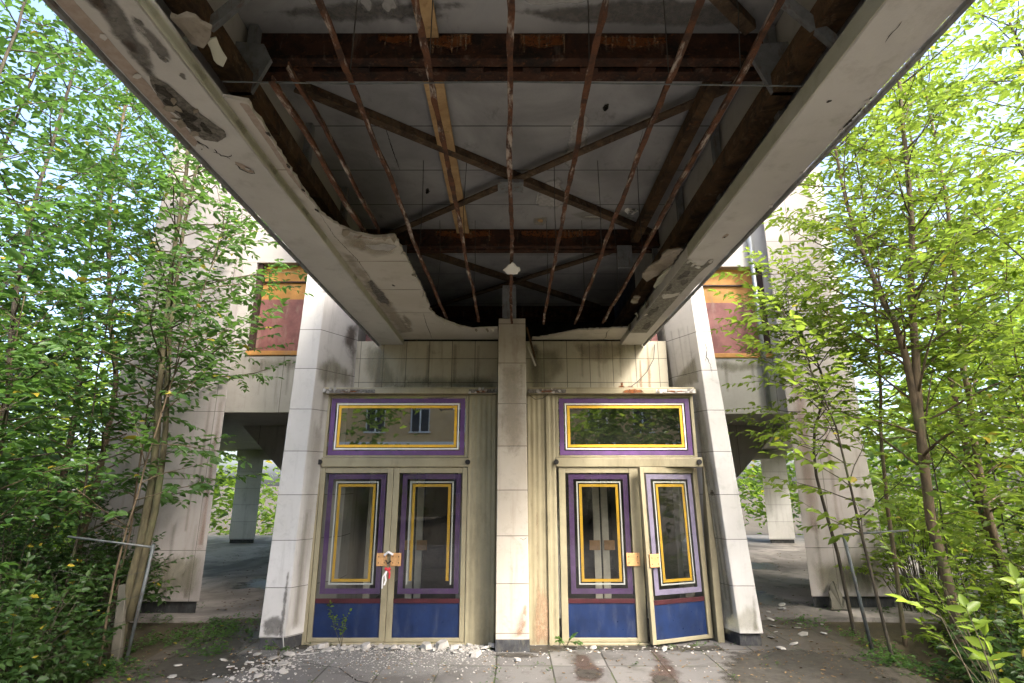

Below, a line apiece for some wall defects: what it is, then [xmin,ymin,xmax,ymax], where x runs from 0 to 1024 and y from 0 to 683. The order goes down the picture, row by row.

damp [87,0,169,76]
peeling [55,0,227,149]
corrosion [428,34,472,51]
corrosion [521,34,565,48]
peeling [630,248,713,333]
damp [132,576,288,682]